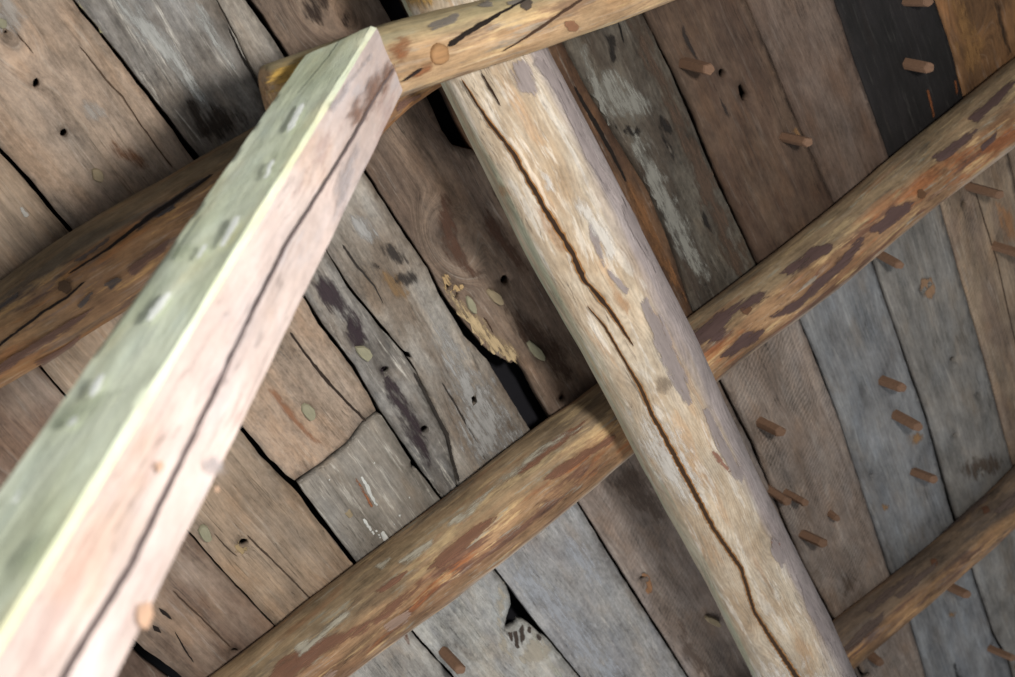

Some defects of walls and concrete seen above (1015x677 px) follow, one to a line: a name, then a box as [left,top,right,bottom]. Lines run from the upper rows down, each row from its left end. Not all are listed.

crack [461,73,801,677]